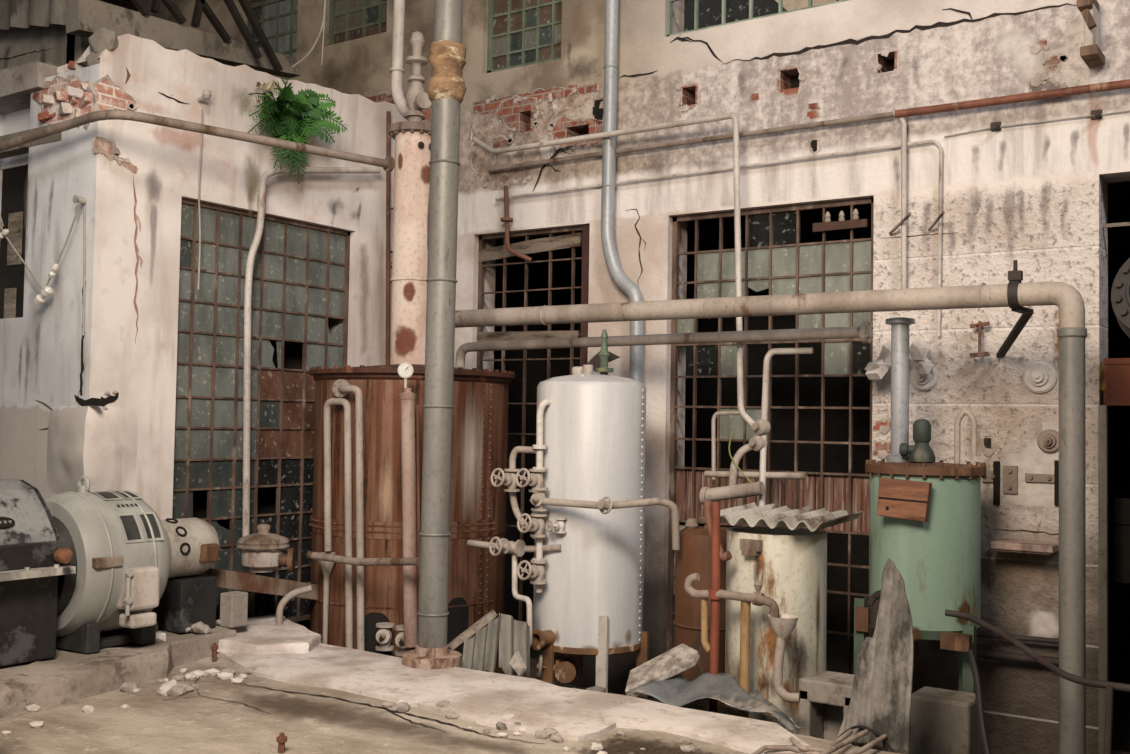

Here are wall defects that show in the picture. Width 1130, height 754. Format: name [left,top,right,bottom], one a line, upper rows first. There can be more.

spalling [39,27,138,174]
spalling [469,83,604,190]
spalling [675,81,701,112]
spalling [776,64,807,99]
spalling [807,103,820,119]
crack [670,3,1076,64]
spalling [875,49,902,74]
crack [133,175,143,343]